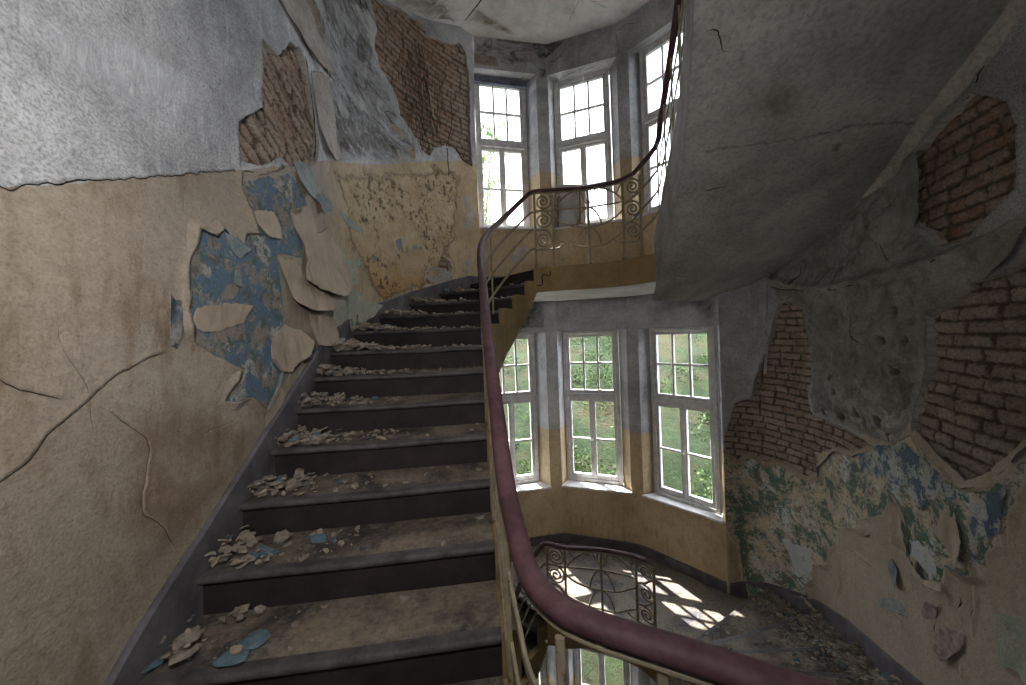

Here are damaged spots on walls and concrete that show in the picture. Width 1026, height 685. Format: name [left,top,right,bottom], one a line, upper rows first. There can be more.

peeling [301,34,344,161]
leakage [321,0,410,151]
peeling [895,152,919,231]
peeling [170,157,383,427]
flaking render [425,253,454,284]
peeling [723,429,1026,662]